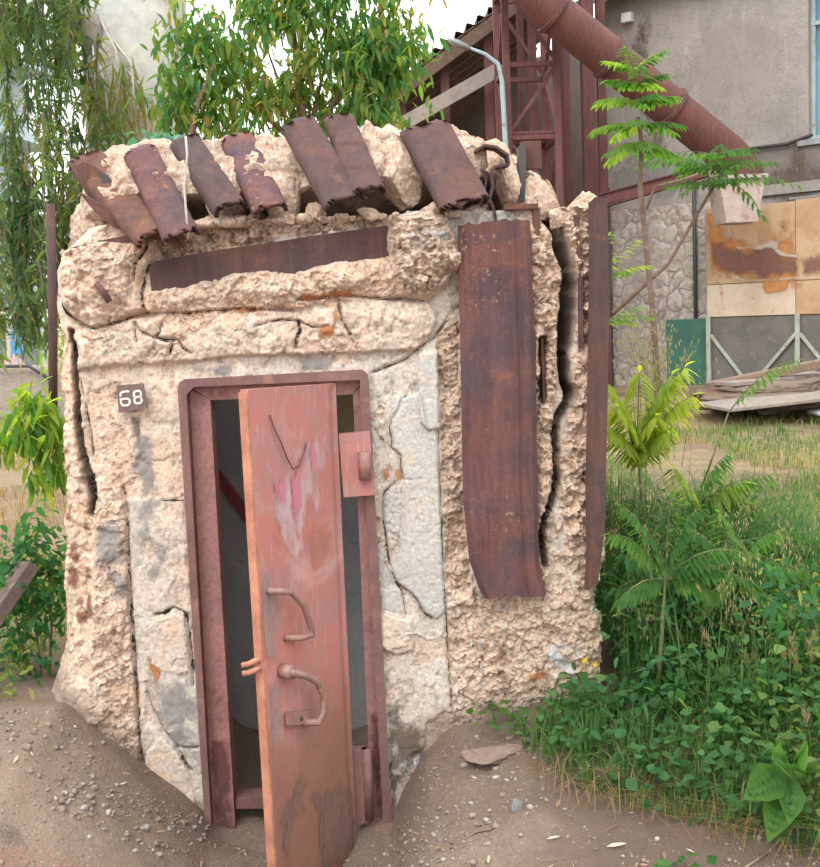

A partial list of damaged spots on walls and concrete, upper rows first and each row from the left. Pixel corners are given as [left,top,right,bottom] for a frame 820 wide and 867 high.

crack [62,245,424,498]
crack [373,322,445,372]
crack [556,347,566,356]
crack [538,405,566,561]
crack [375,423,452,705]